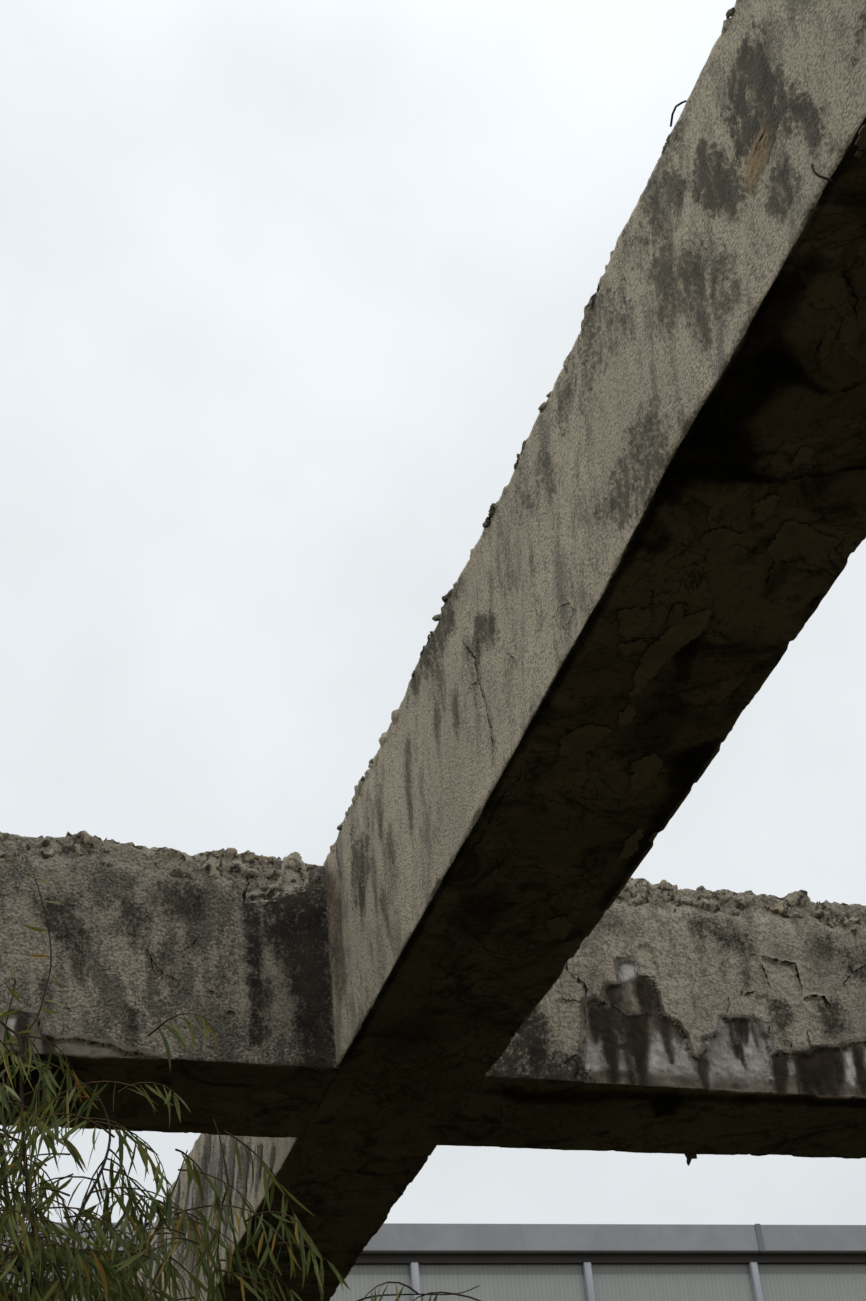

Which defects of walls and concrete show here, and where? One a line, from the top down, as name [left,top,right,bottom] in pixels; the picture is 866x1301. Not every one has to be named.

spalling [581,250,614,333]
water stain [513,13,853,523]
spalling [470,485,508,560]
crack [803,593,825,623]
water stain [241,256,818,1067]
spalling [330,697,405,852]
water stain [29,892,88,985]
spalling [0,830,321,908]
water stain [122,877,206,940]
spalling [617,878,866,936]
water stain [485,1006,866,1118]
flaking render [577,939,866,1097]